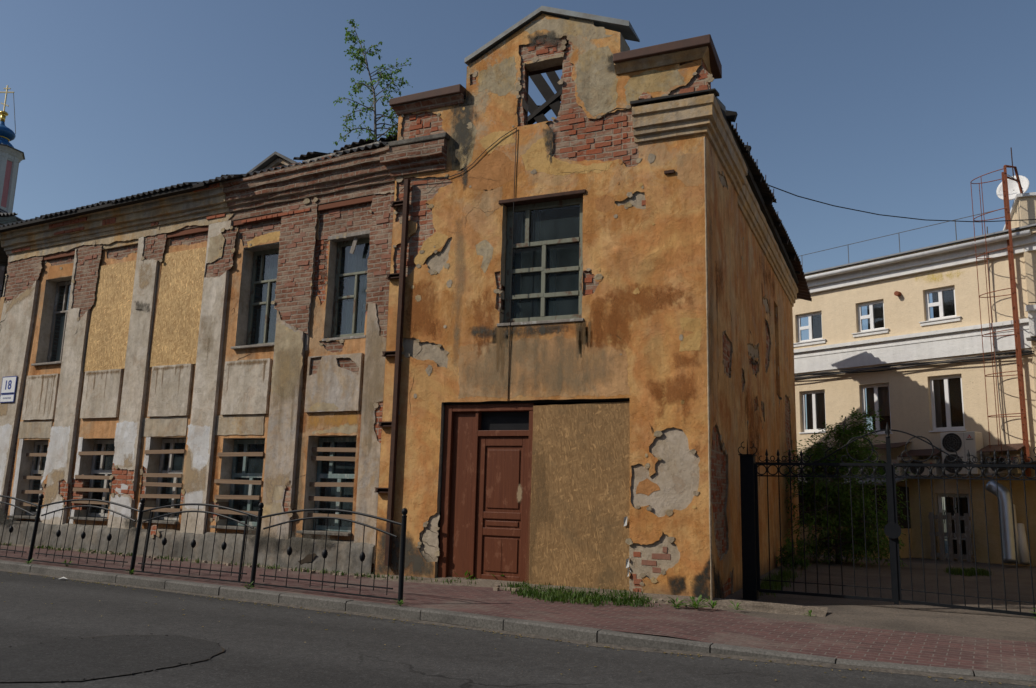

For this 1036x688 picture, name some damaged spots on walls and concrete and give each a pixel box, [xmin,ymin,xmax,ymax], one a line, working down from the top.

spalling [0,17,714,399]
peeling [0,423,12,498]
peeling [36,426,84,521]
peeling [109,421,147,519]
peeling [186,424,210,471]
peeling [181,489,219,522]
peeling [262,481,293,519]
peeling [308,402,338,411]
peeling [312,423,358,435]
spalling [631,427,727,559]
spalling [417,512,440,562]
spalling [625,533,680,592]